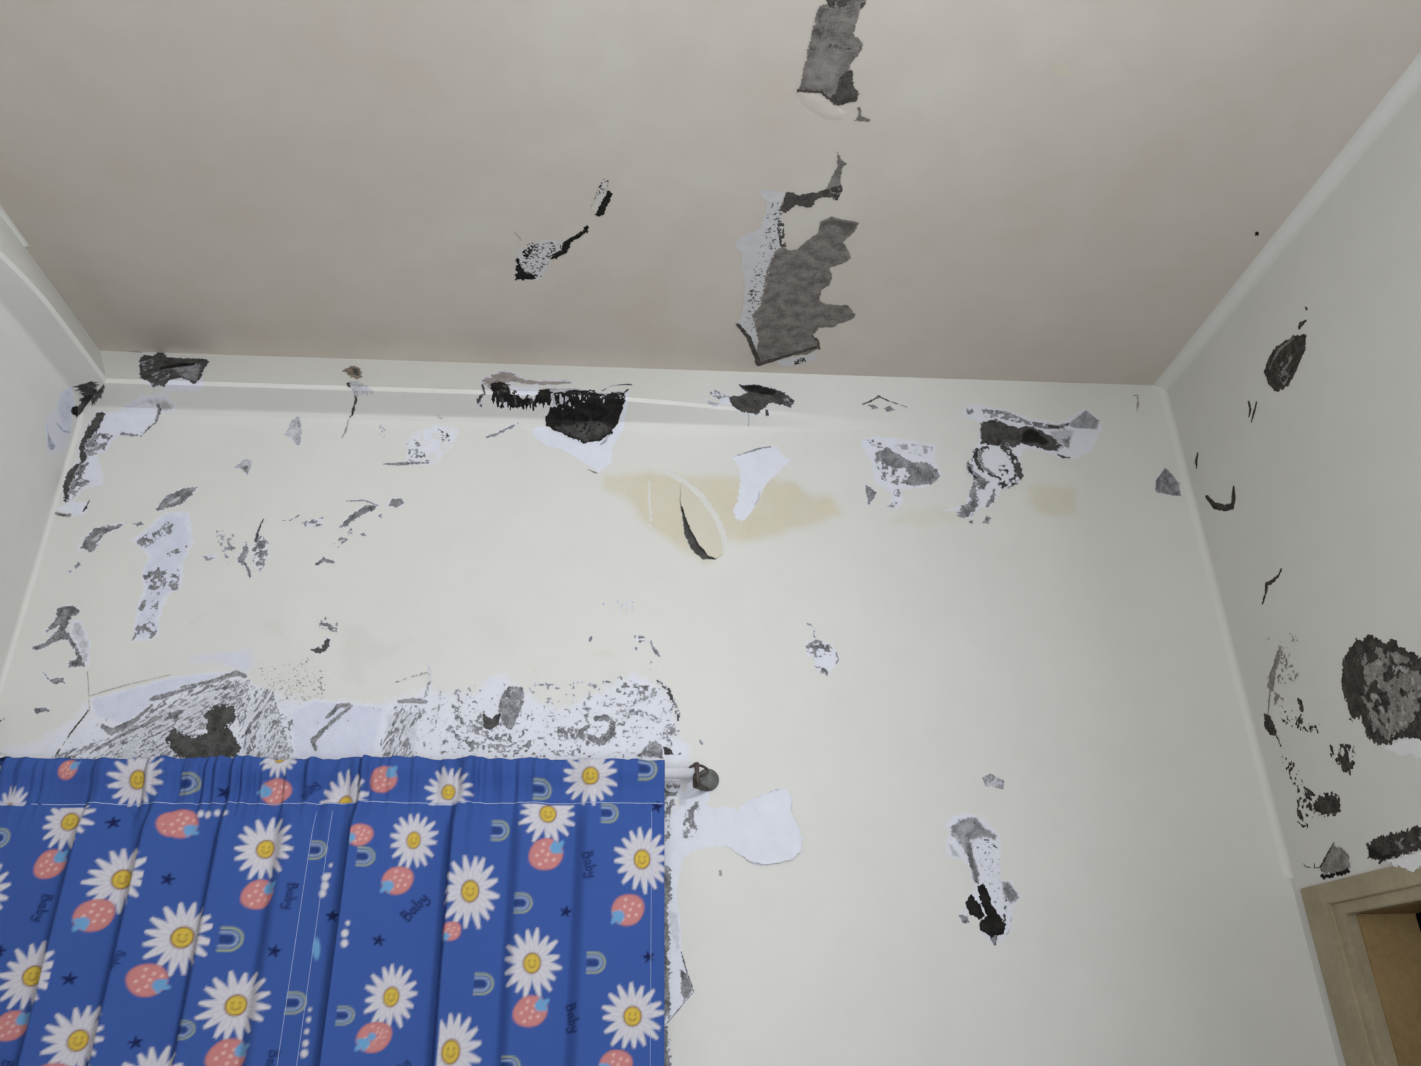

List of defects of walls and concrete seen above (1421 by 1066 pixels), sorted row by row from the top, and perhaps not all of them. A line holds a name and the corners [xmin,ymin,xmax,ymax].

peeling [797,0,871,122]
peeling [734,151,859,366]
peeling [42,351,271,644]
flaking render [476,369,632,474]
damp [597,466,849,572]
flaking render [705,383,796,427]
peeling [943,404,1102,524]
flaking render [1264,306,1308,392]
flaking render [1264,633,1421,828]
peeling [0,617,804,1066]
peeling [942,810,1023,948]
flaking render [1366,825,1421,872]